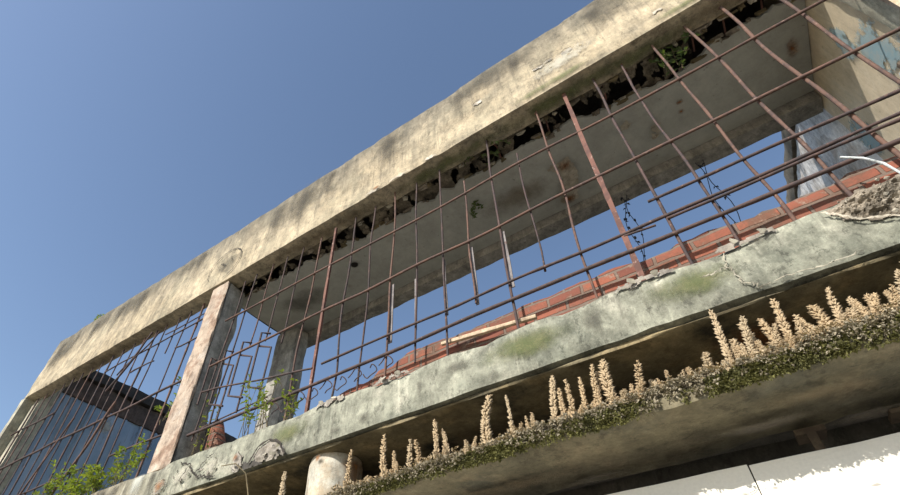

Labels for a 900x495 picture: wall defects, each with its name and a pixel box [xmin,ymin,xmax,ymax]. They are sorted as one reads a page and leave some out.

spalling [532,44,582,73]
peeling [829,19,900,76]
flaking render [308,182,432,258]
spalling [821,174,900,221]
crack [702,253,762,288]